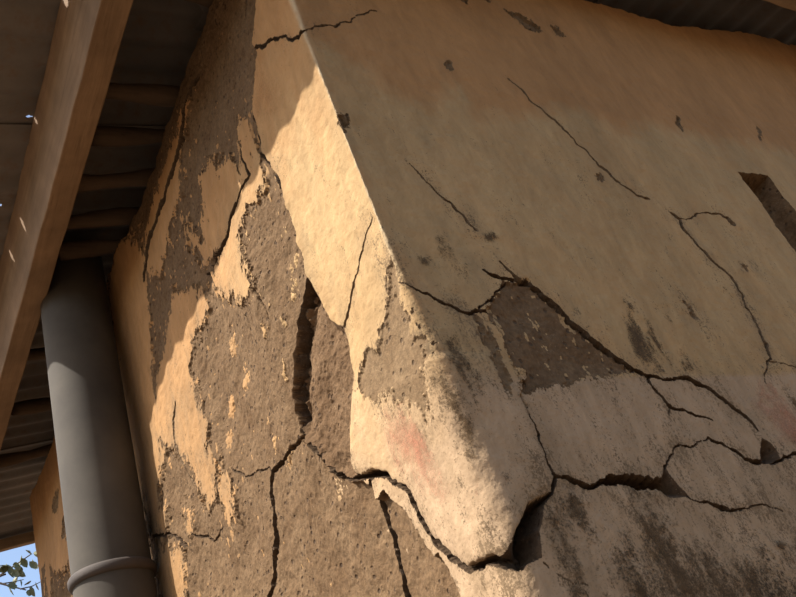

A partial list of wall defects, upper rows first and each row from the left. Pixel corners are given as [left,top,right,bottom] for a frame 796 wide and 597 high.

crack [254,9,377,50]
crack [207,115,282,276]
flaking render [117,0,460,597]
crack [231,210,589,597]
flaking render [472,277,635,395]
crack [399,260,796,509]
crack [670,212,796,384]
flaking render [49,560,73,597]
crack [149,527,223,548]
damp [529,483,597,597]
damp [596,489,796,597]
crack [688,497,783,513]